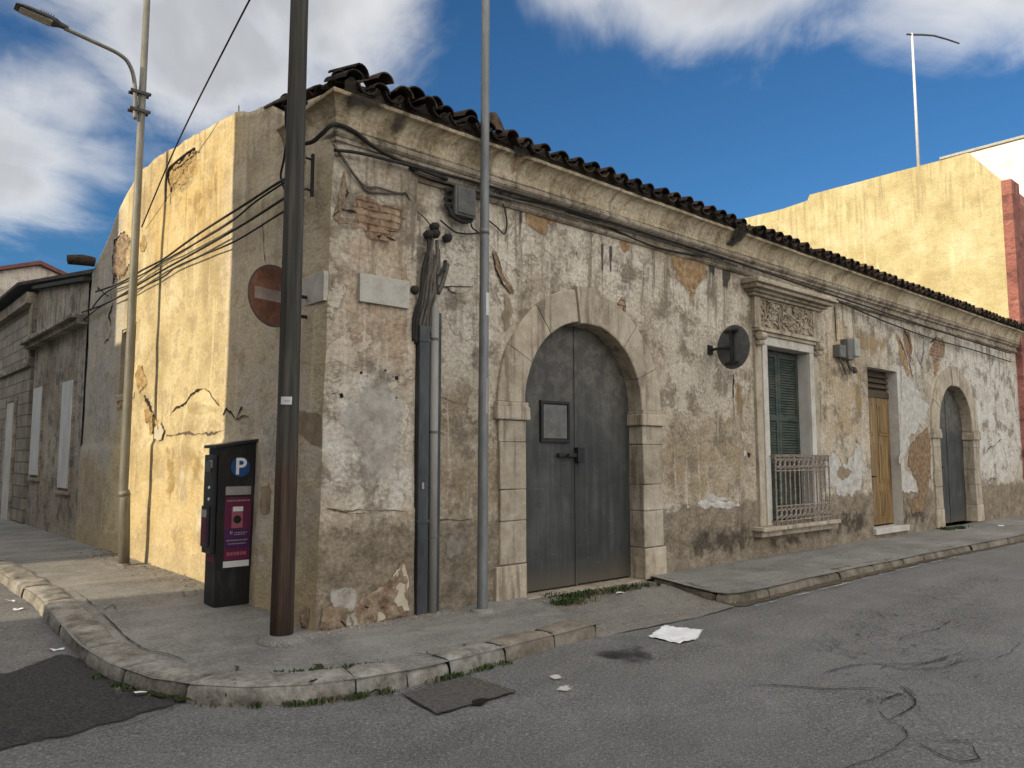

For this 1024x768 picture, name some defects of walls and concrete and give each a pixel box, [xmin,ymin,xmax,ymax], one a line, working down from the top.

flaking render [167,143,200,198]
spalling [333,172,405,244]
peeling [522,212,559,239]
flaking render [112,227,146,283]
peeling [668,254,708,297]
crack [166,388,248,436]
peeling [896,331,945,514]
peeling [822,438,866,499]
peeling [665,493,740,513]
flaking render [299,559,409,630]
crack [820,643,1020,762]